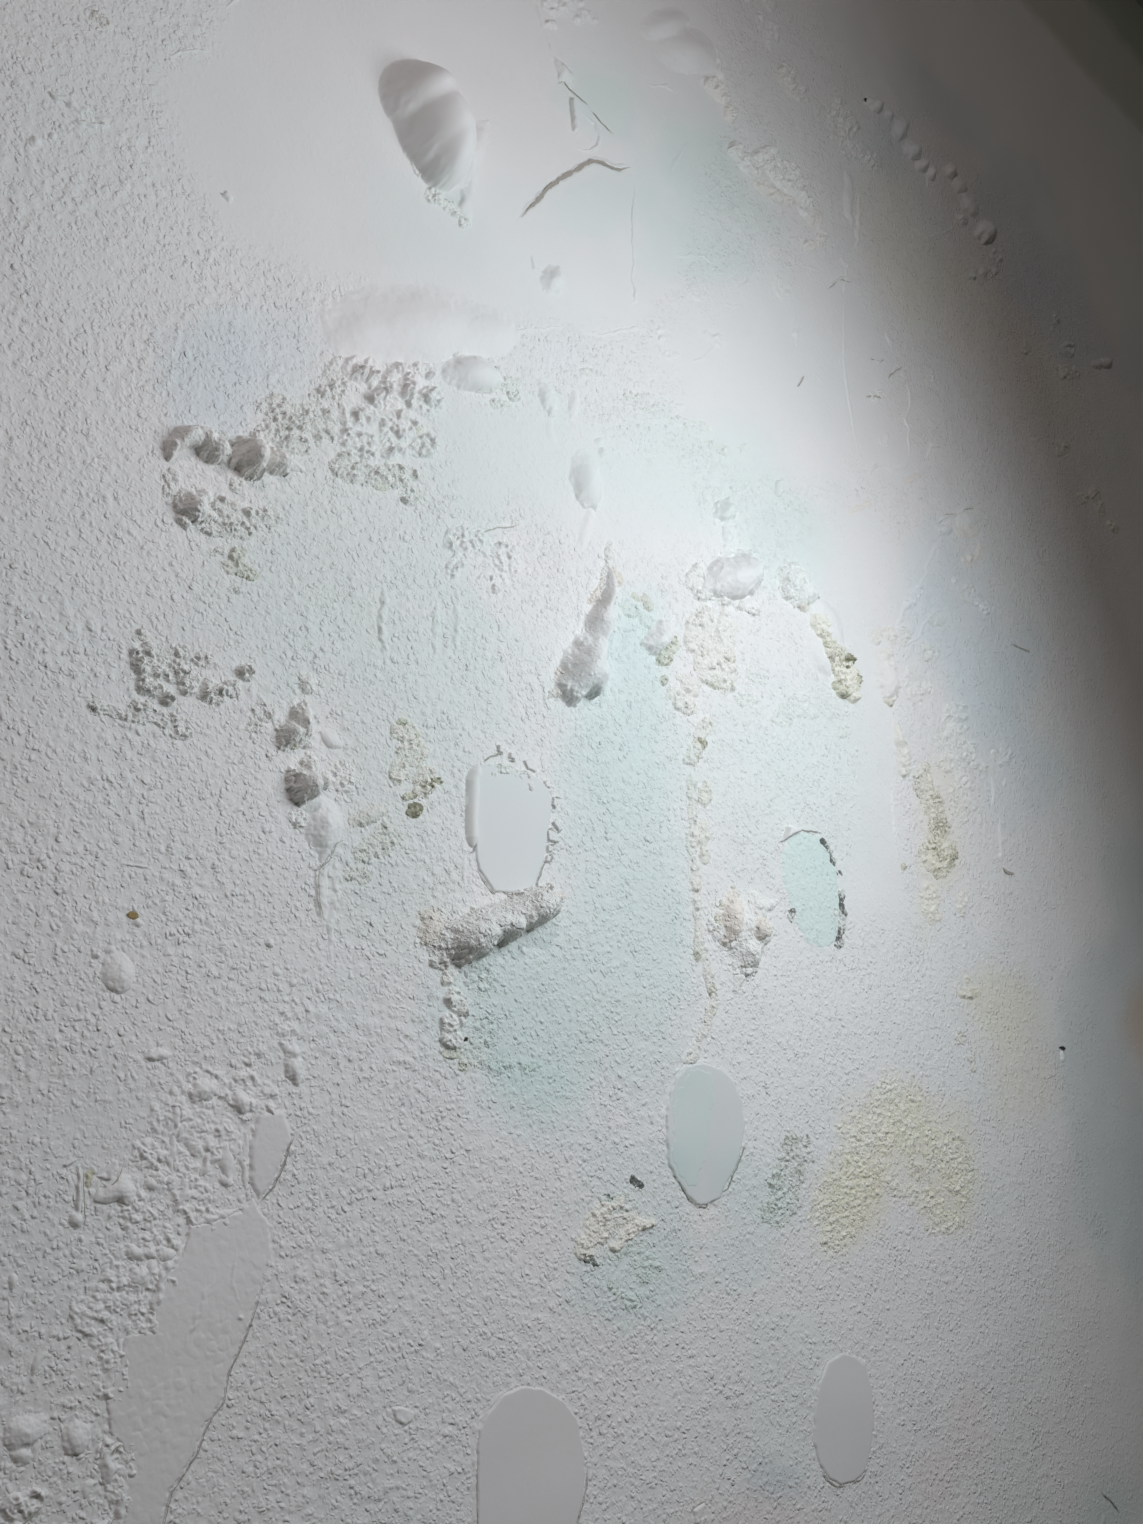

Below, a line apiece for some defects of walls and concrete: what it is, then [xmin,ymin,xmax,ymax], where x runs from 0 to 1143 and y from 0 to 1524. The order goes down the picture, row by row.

peeling [464,744,563,895]
peeling [779,826,847,949]
spalling [62,967,322,1402]
spalling [0,1487,45,1524]
spalling [81,1433,137,1524]